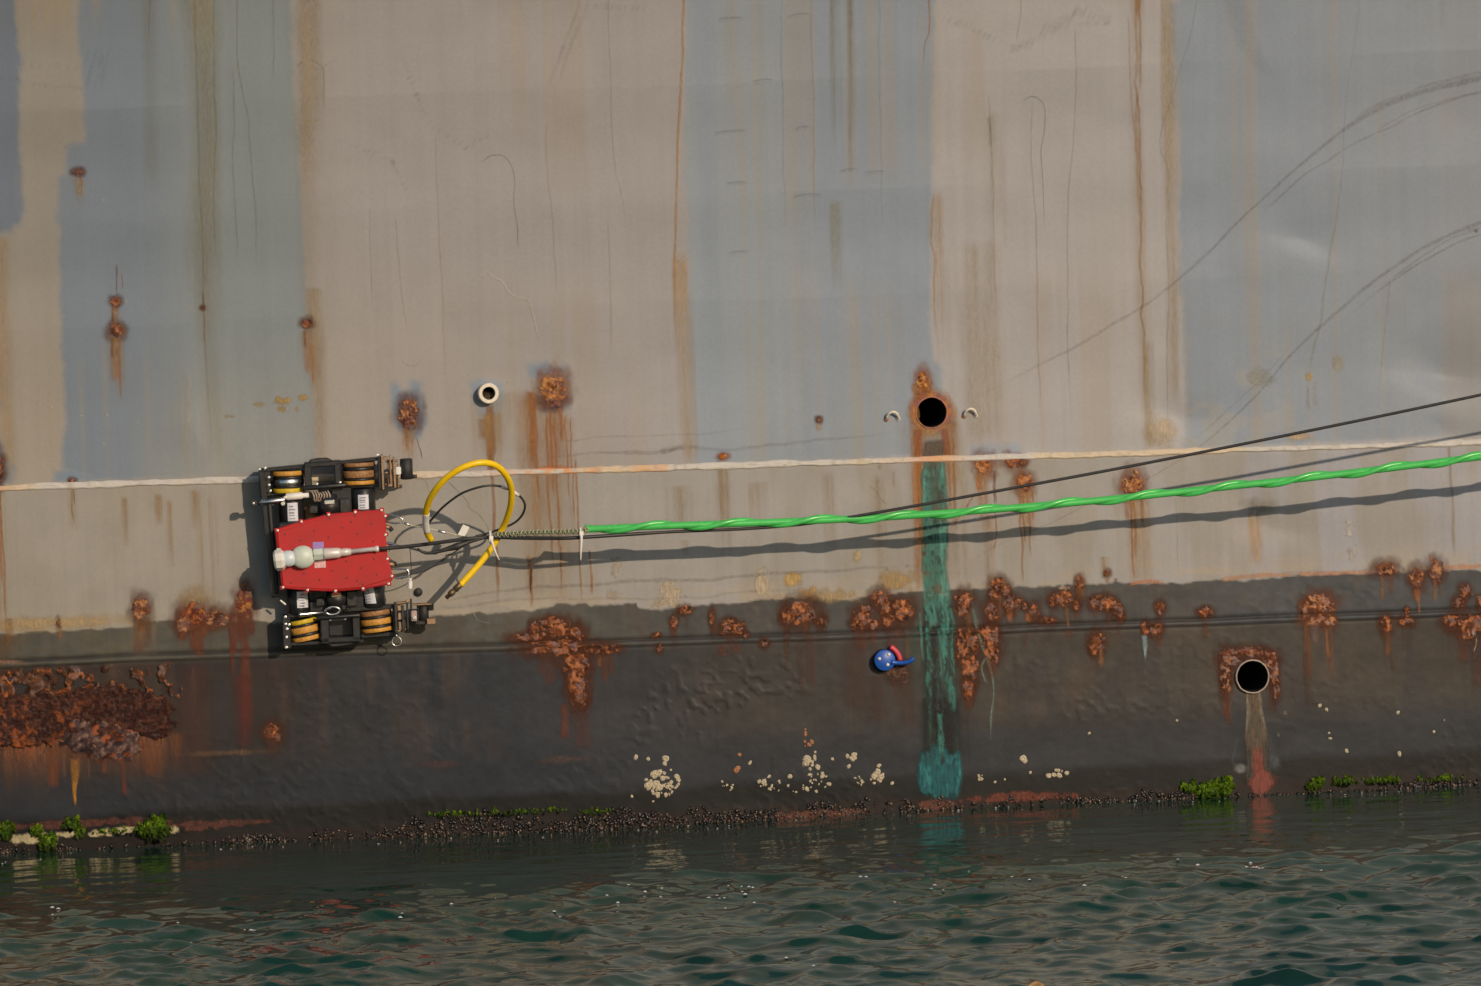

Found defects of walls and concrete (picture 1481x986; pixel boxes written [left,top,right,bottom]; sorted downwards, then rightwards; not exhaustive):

rust [397,396,422,431]
rust [525,369,578,542]
rust [781,371,955,632]
rust [973,454,1034,503]
rust [0,617,183,801]
rust [509,615,621,736]
leakage [918,441,962,799]
rust [953,575,1165,702]
rust [1218,646,1280,711]
leakage [1236,692,1278,796]
rust [1299,592,1337,665]
rust [1302,559,1481,650]